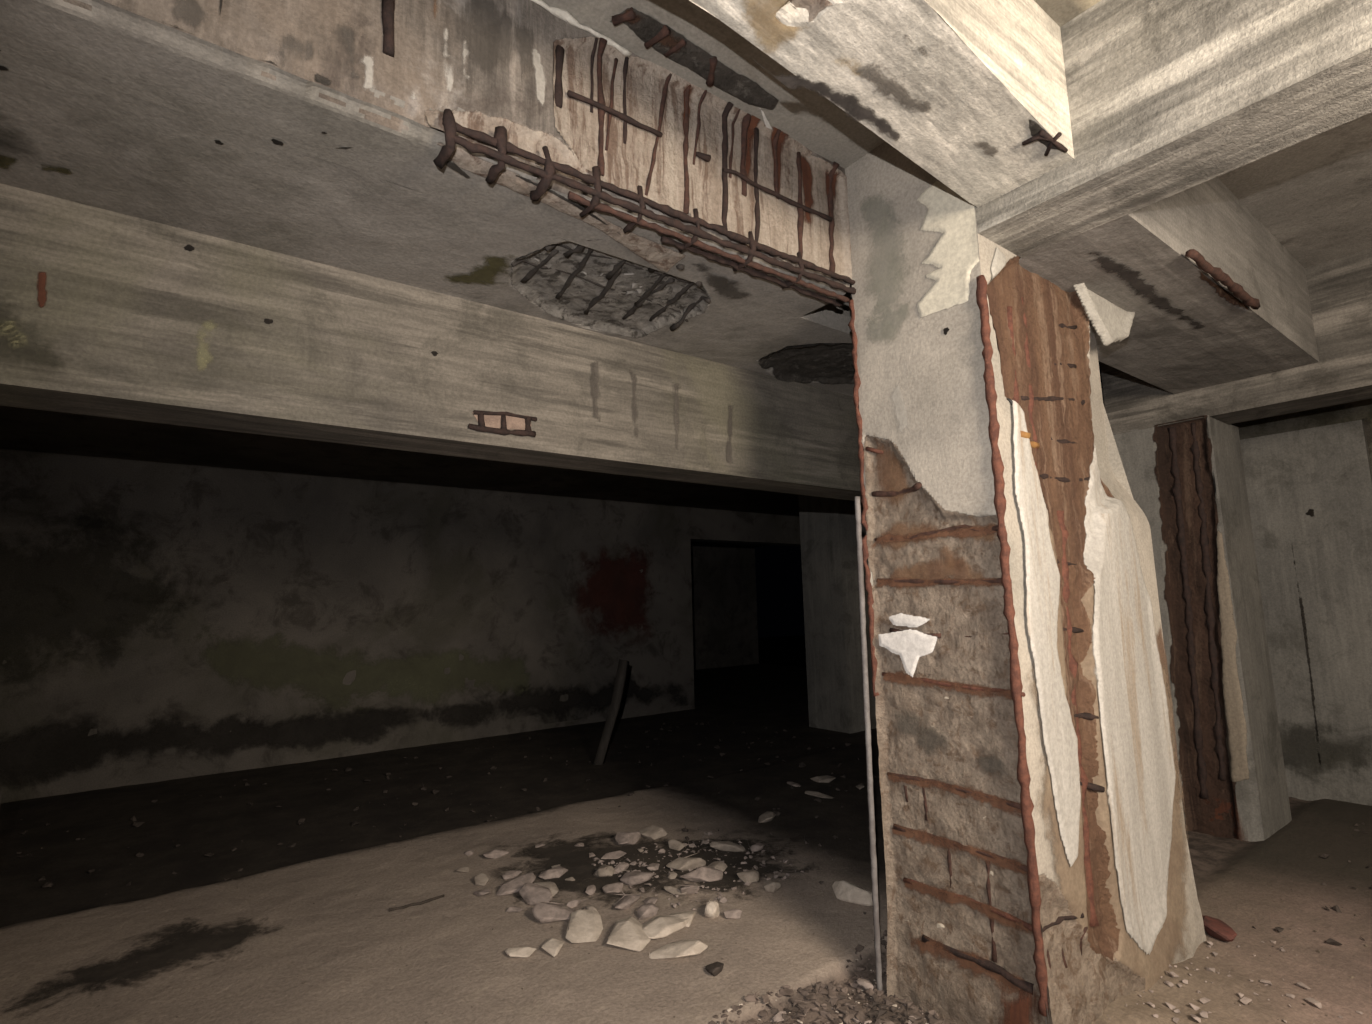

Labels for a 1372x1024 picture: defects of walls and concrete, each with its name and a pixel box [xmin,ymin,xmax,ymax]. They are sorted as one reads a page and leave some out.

spalling [788,0,833,22]
spalling [425,7,1260,1024]